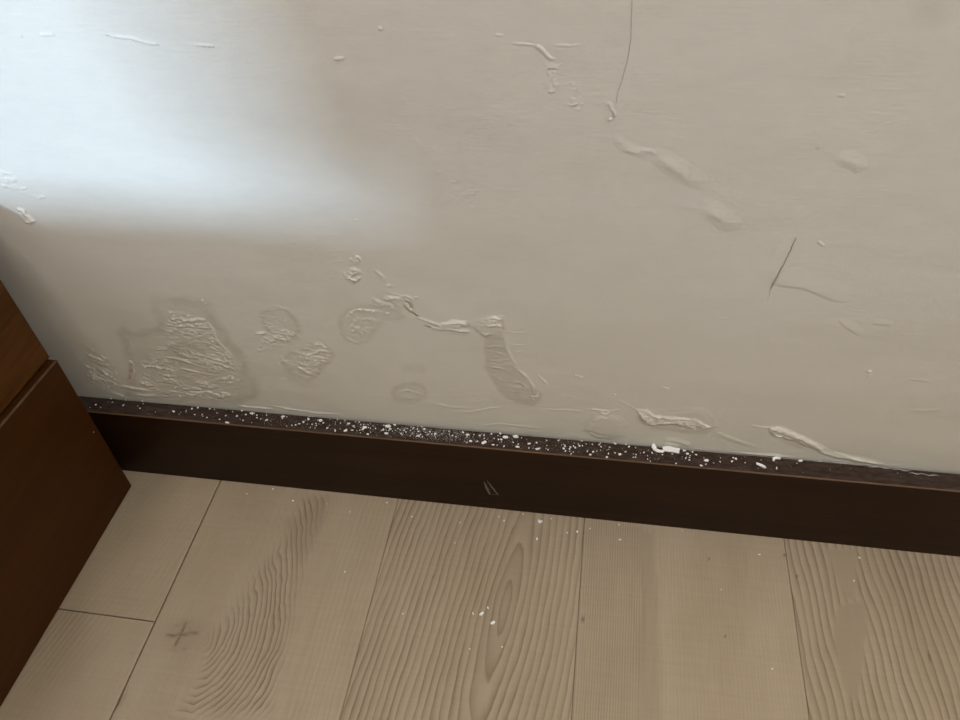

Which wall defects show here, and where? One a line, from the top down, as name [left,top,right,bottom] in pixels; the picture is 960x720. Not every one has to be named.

crack [616,9,632,101]
crack [763,239,850,303]